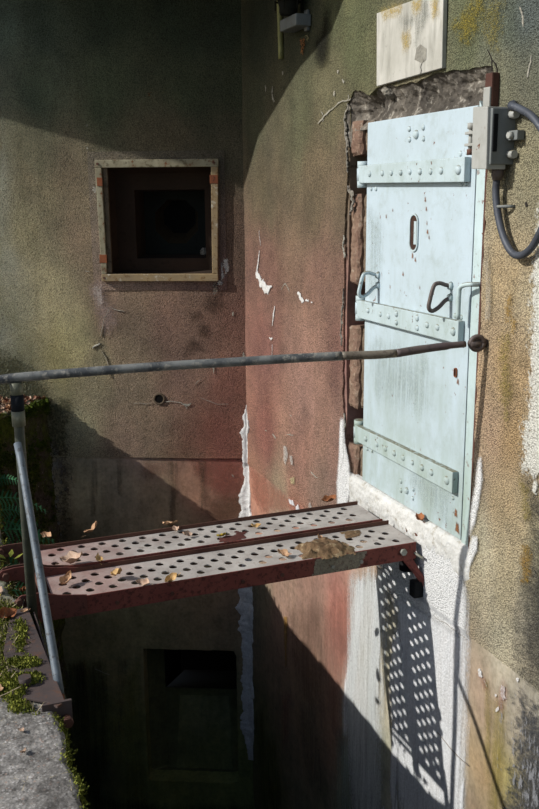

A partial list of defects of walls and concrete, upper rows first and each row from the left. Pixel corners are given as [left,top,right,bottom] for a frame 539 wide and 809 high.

crack [318,95,351,124]
spalling [343,44,493,173]